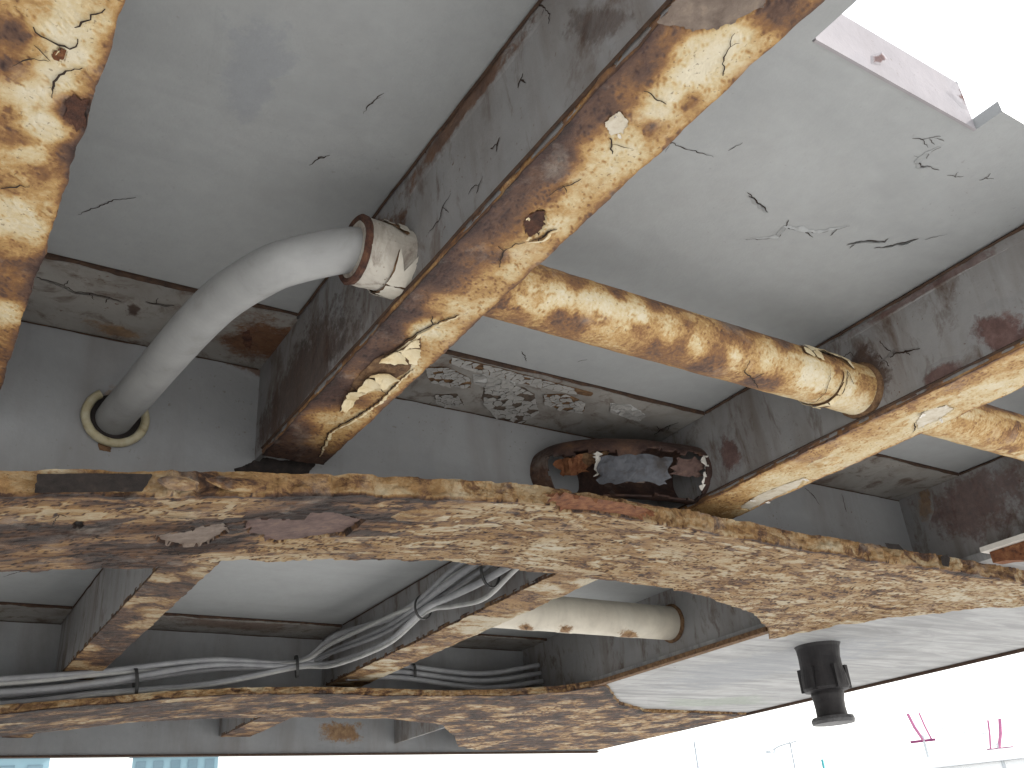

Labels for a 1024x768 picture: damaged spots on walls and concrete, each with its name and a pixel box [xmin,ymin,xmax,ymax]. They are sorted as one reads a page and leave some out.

crack [14,9,105,96]
corrosion [557,0,649,59]
crack [912,136,993,180]
crack [746,192,942,249]
corrosion [157,197,430,493]
peeling [341,337,593,423]
peeling [553,451,609,476]
spalling [155,523,229,547]
spalling [243,512,359,541]
corrosion [898,456,1024,556]
corrosion [554,618,576,634]
corrosion [611,623,645,638]